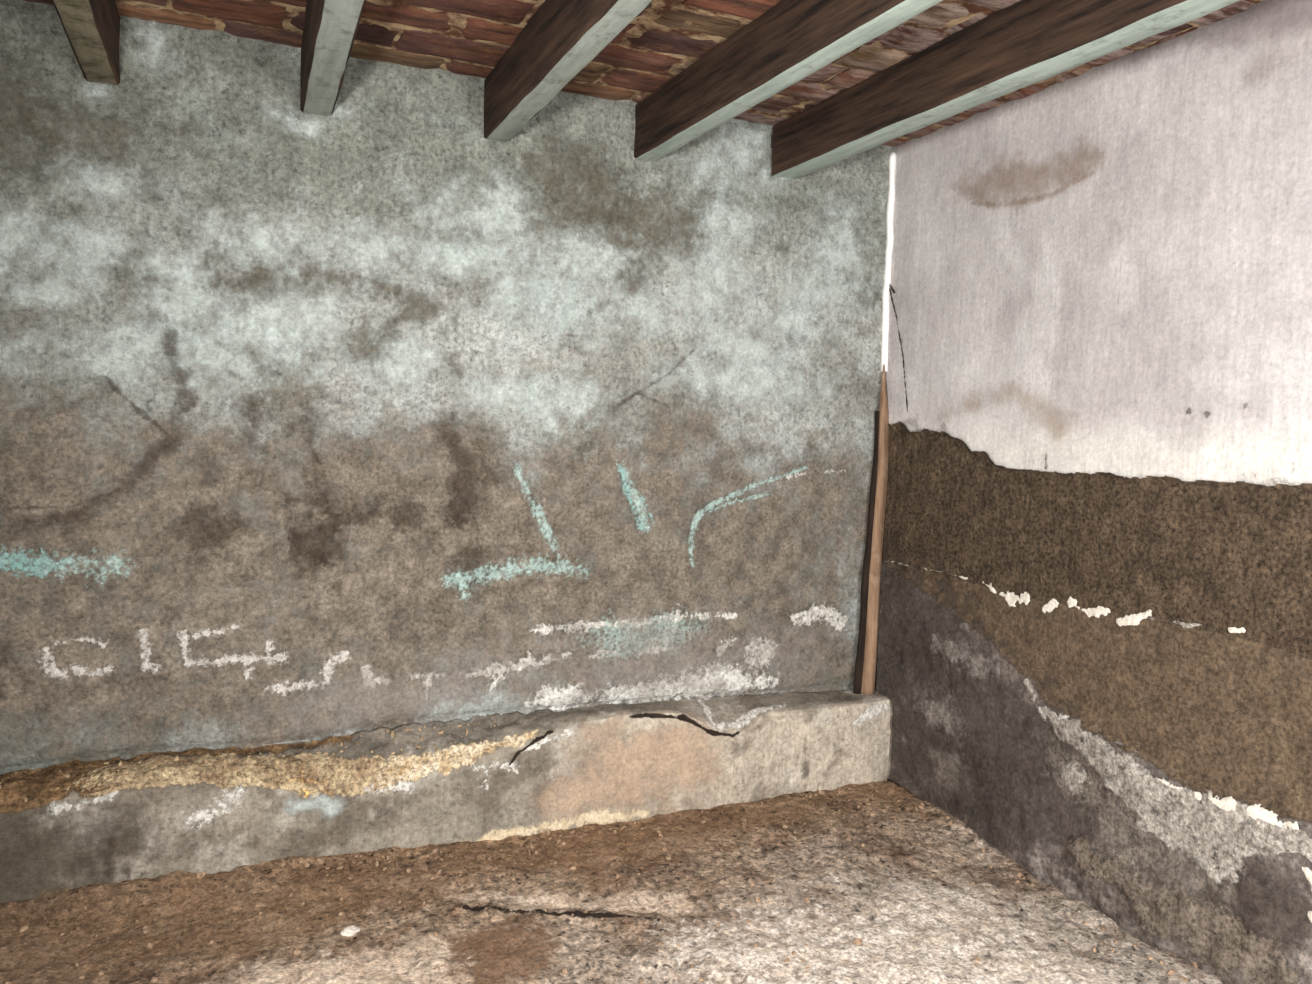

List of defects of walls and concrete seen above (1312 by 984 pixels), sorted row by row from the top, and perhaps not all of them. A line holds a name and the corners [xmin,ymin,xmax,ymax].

water stain [0,214,125,304]
water stain [84,159,124,195]
water stain [83,212,348,387]
water stain [341,119,862,402]
water stain [0,368,872,842]
crack [509,730,553,765]
crack [630,713,739,738]
water stain [852,561,1100,862]
spalling [881,421,1312,984]
water stain [1213,858,1310,950]